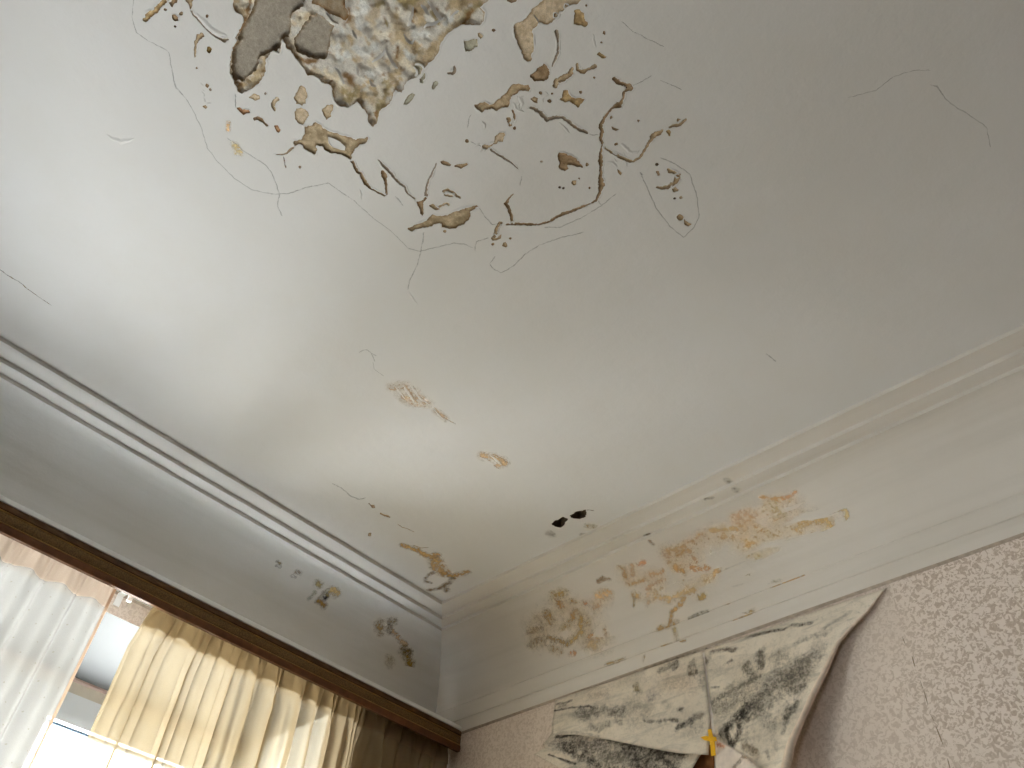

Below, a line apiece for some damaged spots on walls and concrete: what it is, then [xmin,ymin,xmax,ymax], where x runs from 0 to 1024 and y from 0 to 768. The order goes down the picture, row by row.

crack [185,0,229,44]
flaking render [227,0,496,161]
flaking render [473,0,608,131]
crack [551,29,561,67]
crack [349,158,438,217]
flaking render [407,186,480,233]
crack [465,76,688,248]
damp [618,512,760,642]
damp [376,619,415,667]
damp [548,701,683,768]
peeling [693,745,714,768]
damp [648,650,809,753]